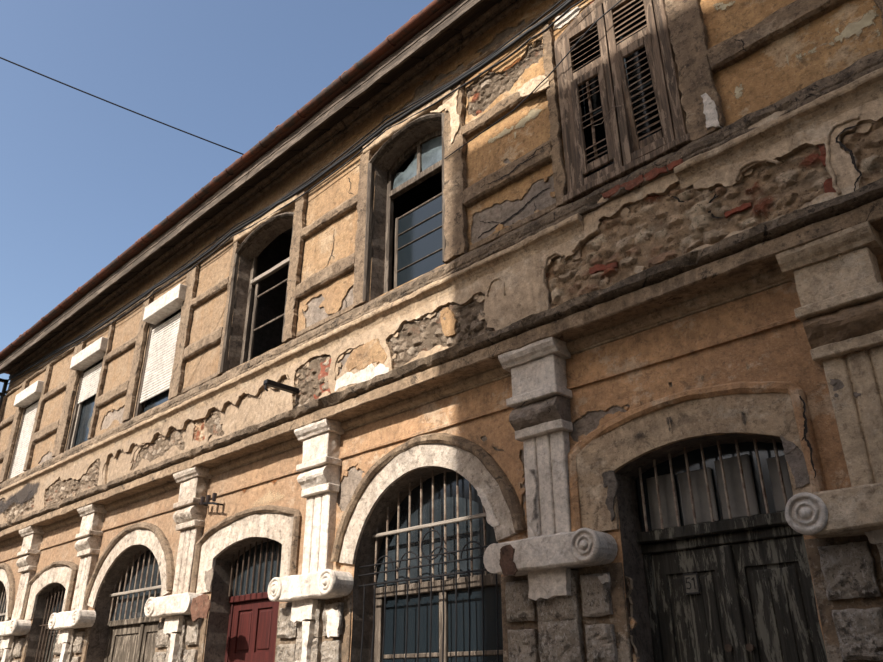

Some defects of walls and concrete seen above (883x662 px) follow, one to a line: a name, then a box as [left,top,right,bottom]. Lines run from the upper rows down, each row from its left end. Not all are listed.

peeling [786,6,881,65]
spalling [430,41,550,144]
flaking render [701,93,722,129]
crack [478,188,549,240]
spalling [546,144,837,309]
spalling [294,287,495,408]
spalling [131,410,224,471]
spalling [0,495,34,522]
spalling [45,459,100,506]